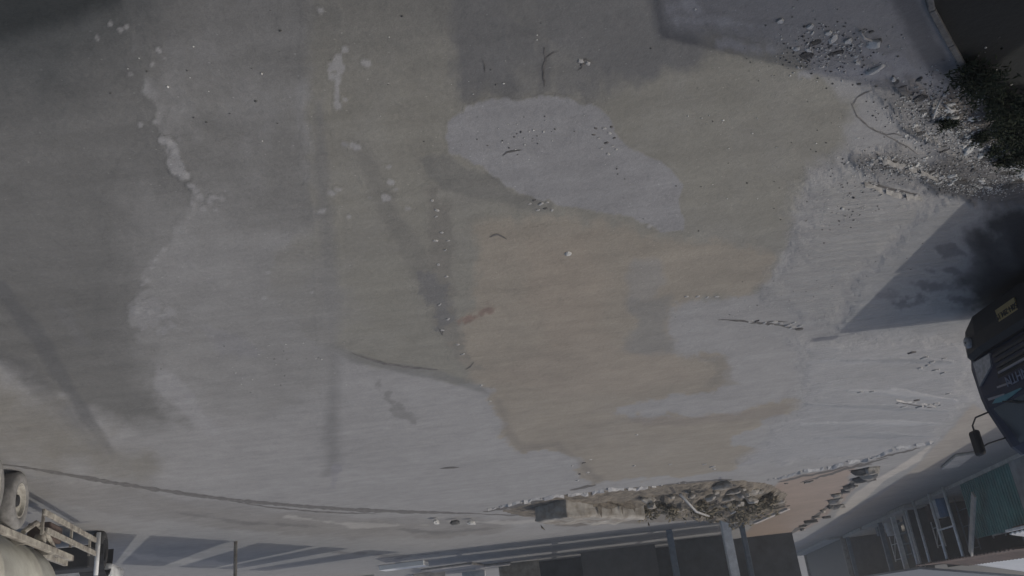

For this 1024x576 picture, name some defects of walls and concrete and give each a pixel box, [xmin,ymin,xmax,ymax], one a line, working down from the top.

spalling [864,155,944,184]
water stain [0,0,745,490]
water stain [443,0,984,487]
water stain [26,476,539,536]
spalling [488,459,663,511]
spalling [767,441,935,482]